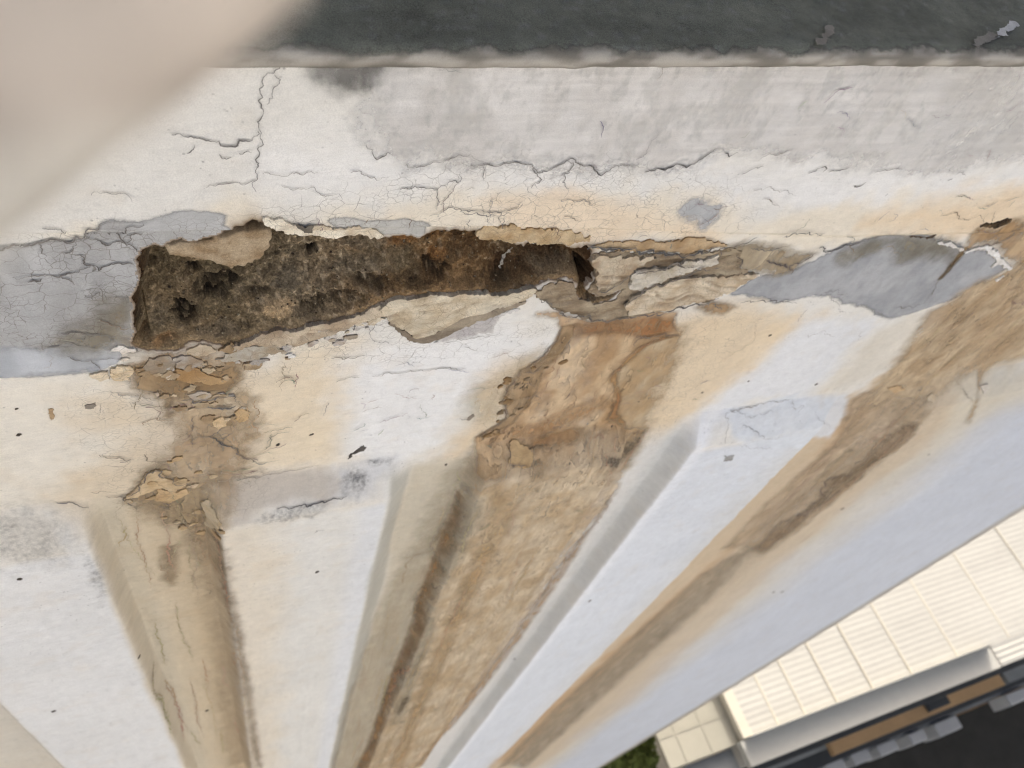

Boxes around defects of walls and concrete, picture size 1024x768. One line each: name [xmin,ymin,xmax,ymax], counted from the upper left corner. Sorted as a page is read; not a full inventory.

crack [172,67,793,242]
peeling [124,456,225,540]
spalling [0,199,1006,430]
crack [57,150,1024,693]
damp [606,331,682,467]
damp [505,391,924,766]